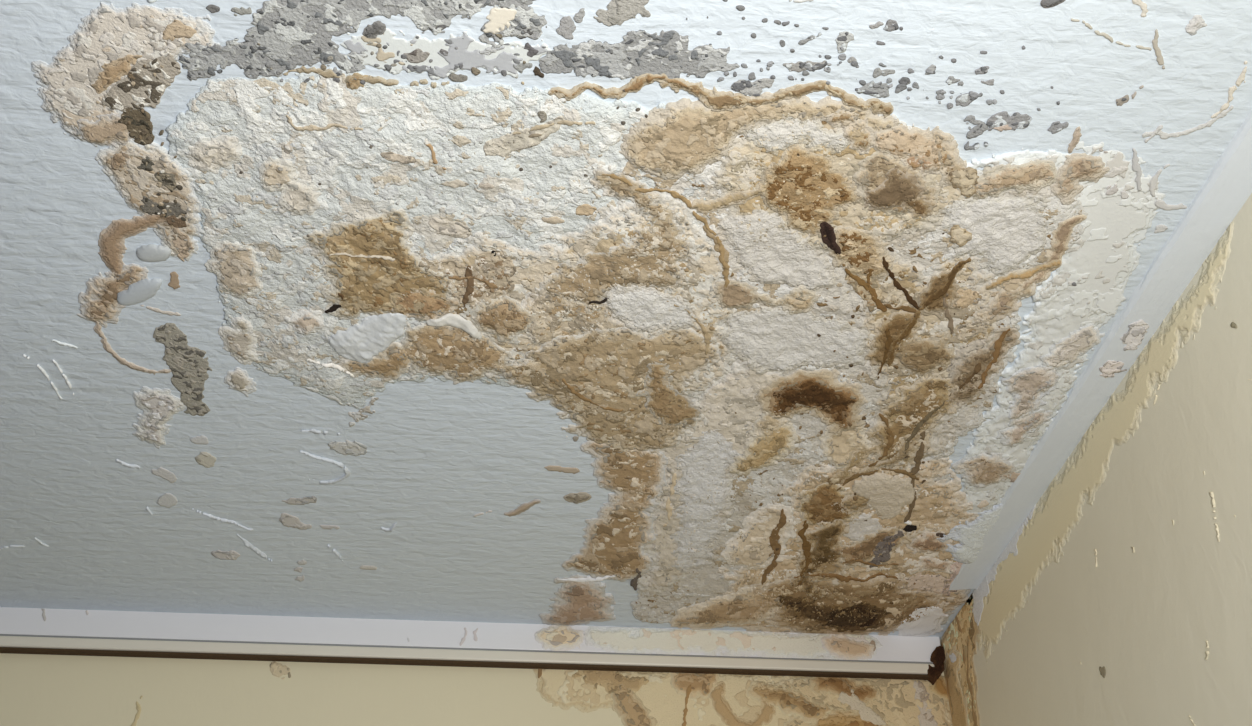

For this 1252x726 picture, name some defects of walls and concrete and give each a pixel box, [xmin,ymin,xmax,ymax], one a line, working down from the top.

damp [31,2,263,449]
damp [283,66,449,88]
flaking render [101,0,1166,570]
damp [258,80,1234,726]
peeling [967,505,1036,626]
damp [1185,15,1207,35]